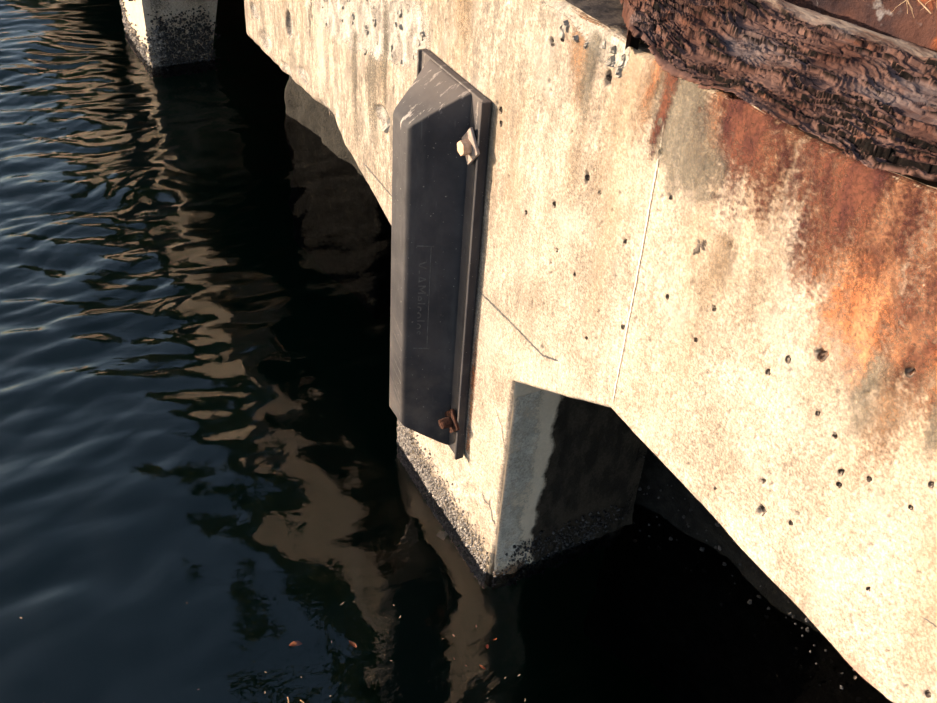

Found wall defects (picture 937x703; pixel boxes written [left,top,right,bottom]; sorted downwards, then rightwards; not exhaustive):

corrosion [697,91,937,417]